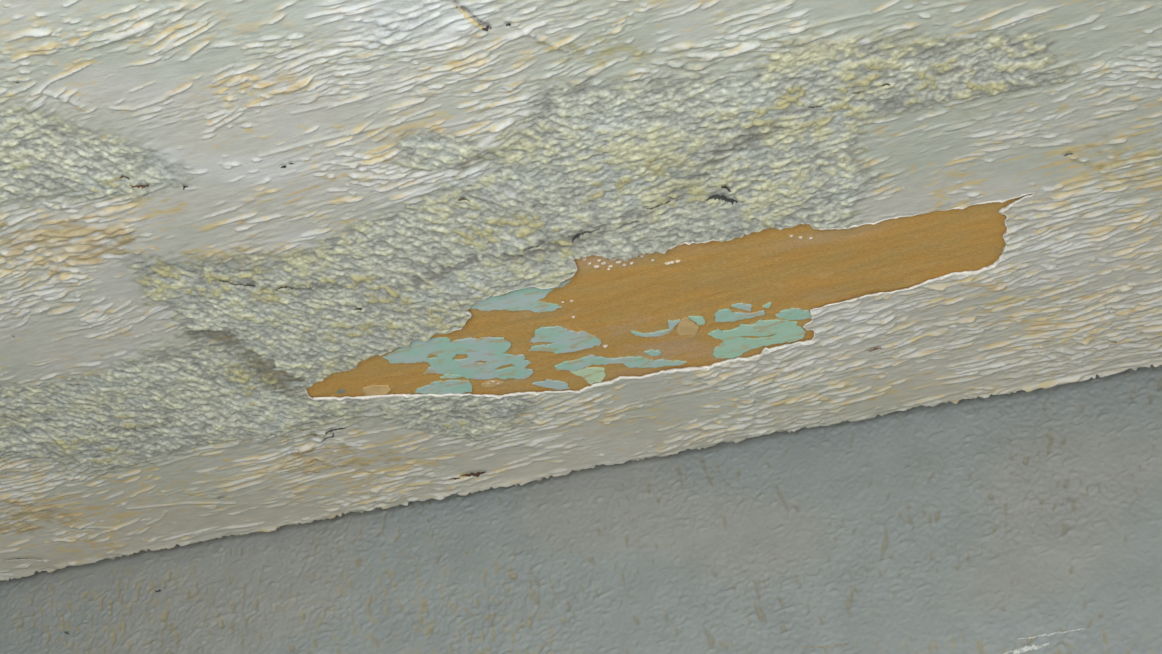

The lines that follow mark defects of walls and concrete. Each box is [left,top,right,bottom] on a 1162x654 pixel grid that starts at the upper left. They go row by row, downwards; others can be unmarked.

peeling [305,191,1036,401]